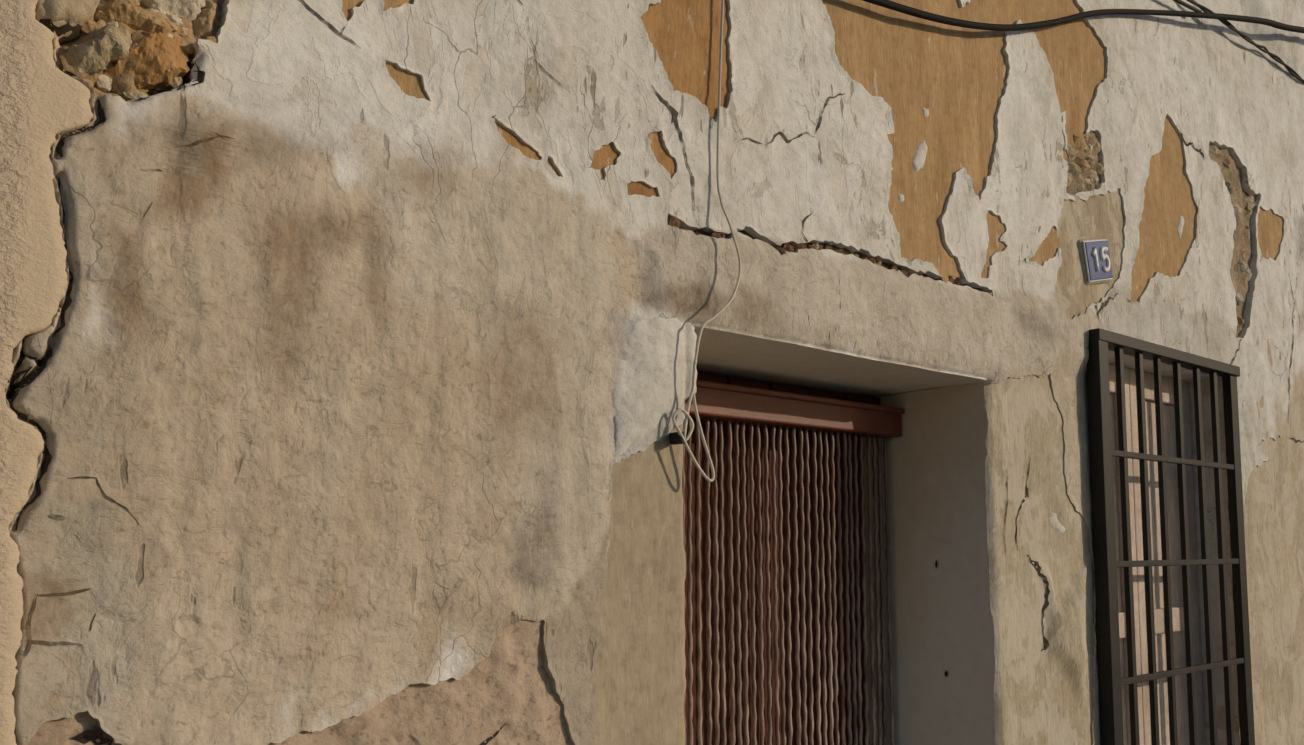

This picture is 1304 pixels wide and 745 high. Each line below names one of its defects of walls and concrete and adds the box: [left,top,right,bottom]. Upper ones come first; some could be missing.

crack [39,19,99,77]
flaking render [42,0,233,104]
flaking render [381,56,435,107]
flaking render [489,115,565,182]
crack [652,86,701,228]
crack [735,93,845,144]
flaking render [581,0,1201,320]
flaking render [1206,137,1286,341]
flaking render [264,317,697,745]
crack [1004,457,1050,652]
flaking render [1243,372,1304,745]
crack [480,724,506,745]